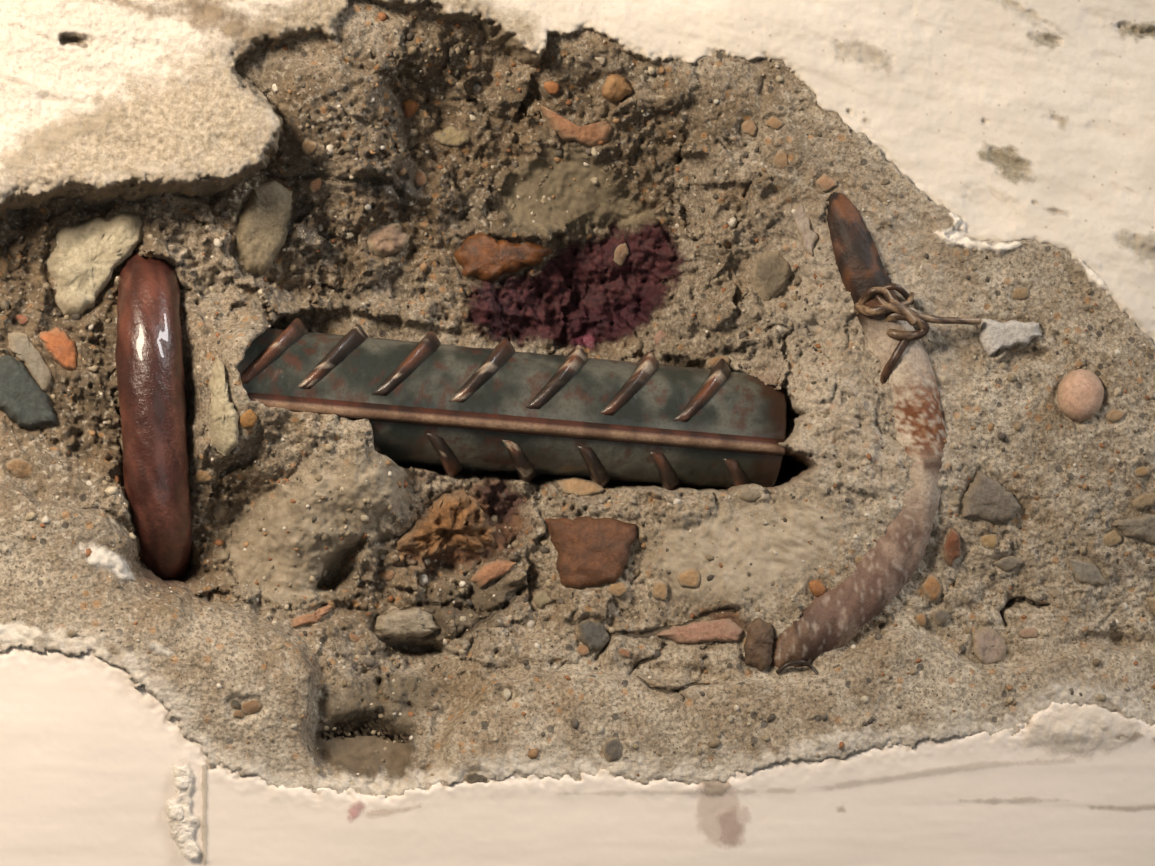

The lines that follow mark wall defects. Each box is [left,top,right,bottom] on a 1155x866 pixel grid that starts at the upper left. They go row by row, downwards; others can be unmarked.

flaking render [259,0,349,38]
flaking render [61,35,83,45]
flaking render [2,52,275,194]
spalling [613,243,629,266]
rust [776,453,807,481]
spalling [677,568,701,588]
spalling [799,741,847,762]
spalling [855,742,883,753]
spalling [365,789,396,798]